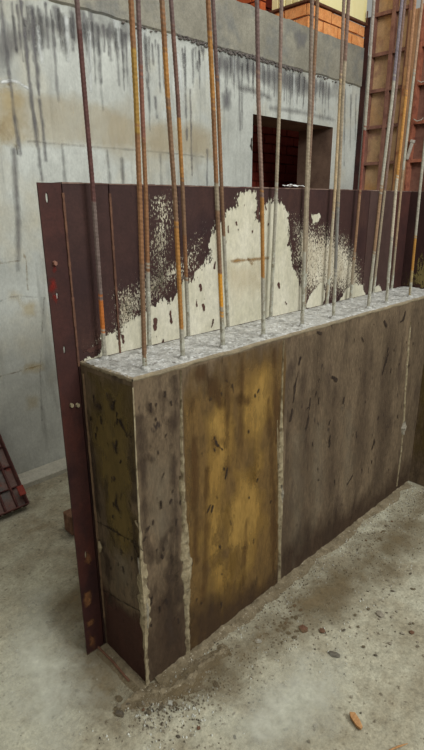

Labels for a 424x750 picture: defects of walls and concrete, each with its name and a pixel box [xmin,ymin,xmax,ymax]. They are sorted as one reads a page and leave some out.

damp [0,0,128,154]
damp [177,46,204,100]
damp [218,56,329,99]
damp [13,116,21,247]
damp [152,470,423,675]